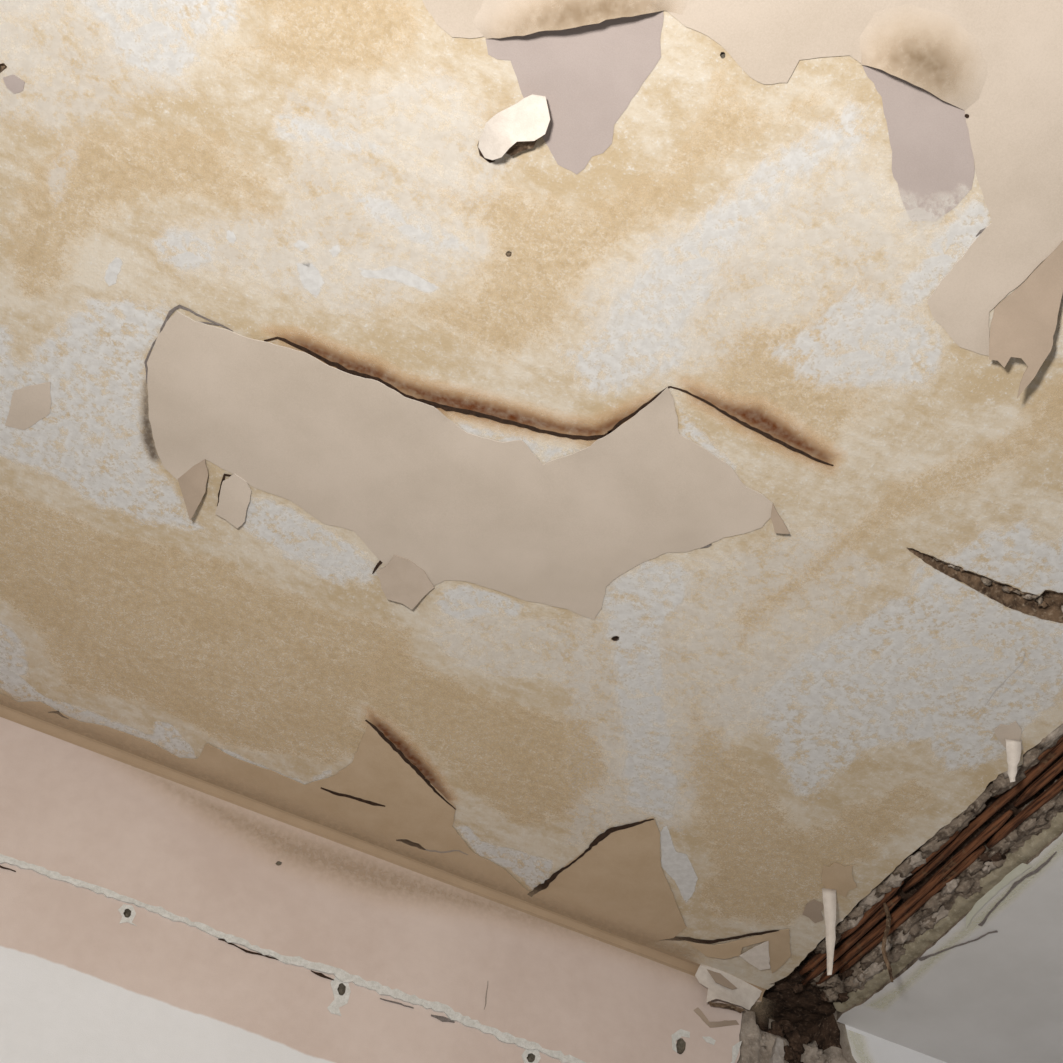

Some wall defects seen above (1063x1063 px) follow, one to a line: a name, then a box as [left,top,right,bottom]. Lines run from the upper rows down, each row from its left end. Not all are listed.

peeling [477,94,550,163]
water stain [443,86,748,351]
peeling [667,0,1063,398]
water stain [0,493,600,821]
peeling [0,297,848,1063]
crack [0,854,586,1063]
water stain [0,700,686,959]
crack [396,839,468,855]
crack [527,819,654,897]
crack [659,930,790,944]
water stain [660,729,924,923]
peeling [802,863,857,976]